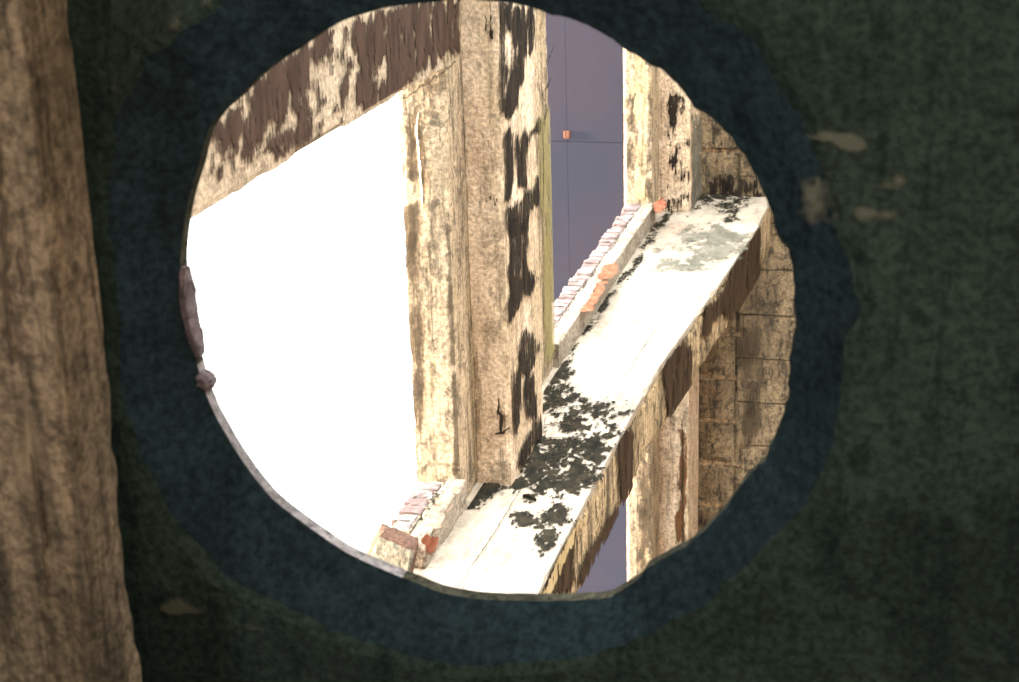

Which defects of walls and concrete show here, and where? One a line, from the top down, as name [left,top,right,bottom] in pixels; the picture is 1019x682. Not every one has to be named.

leakage [404,112,415,182]
leakage [402,200,425,433]
leakage [485,2,539,324]
leakage [513,325,642,471]
leakage [568,91,761,359]